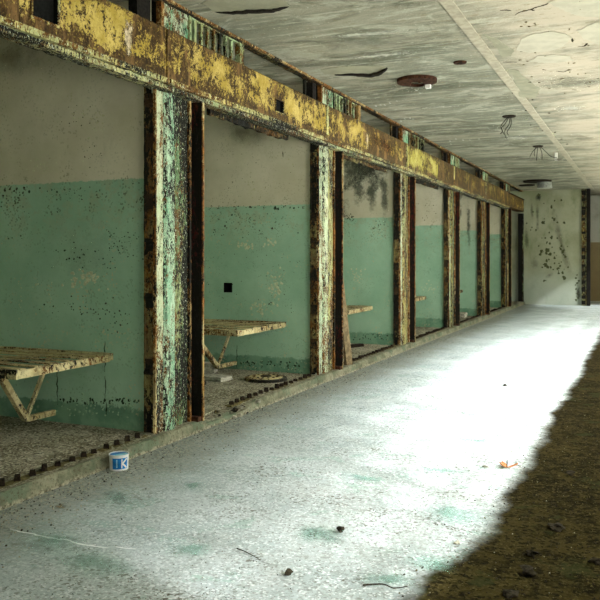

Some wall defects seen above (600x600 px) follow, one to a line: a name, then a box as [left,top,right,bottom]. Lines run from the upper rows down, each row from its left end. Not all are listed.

peeling [321,66,388,78]
water stain [344,161,387,209]